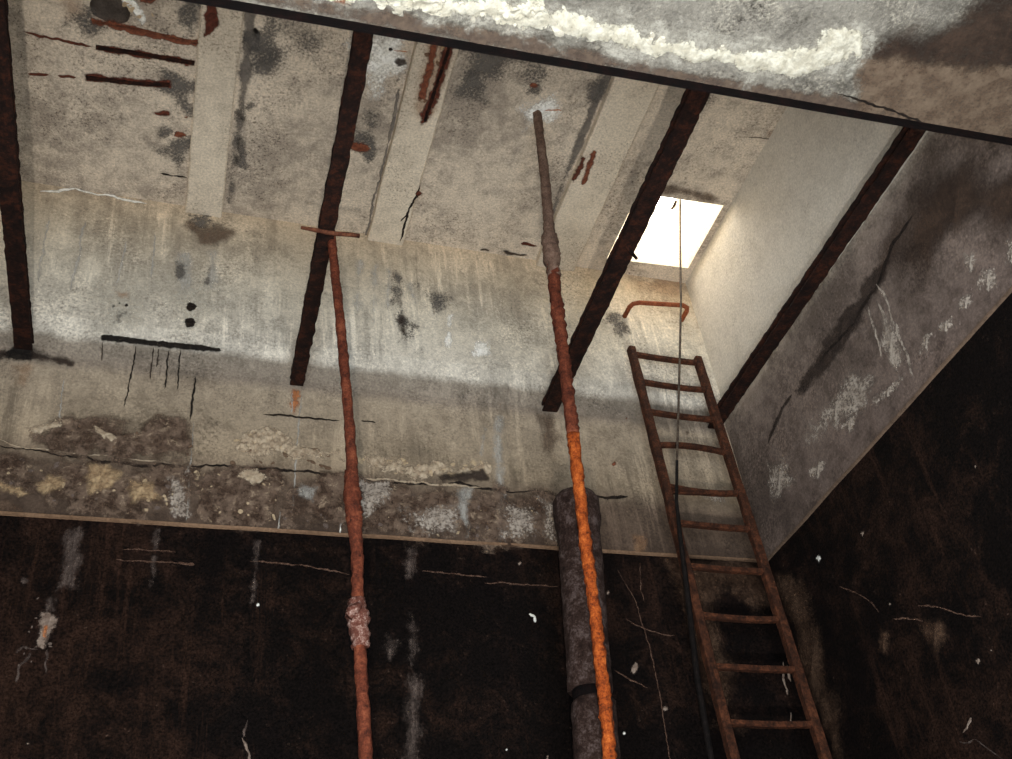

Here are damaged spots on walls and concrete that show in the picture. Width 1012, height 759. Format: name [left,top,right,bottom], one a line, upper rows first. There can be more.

spalling [24,0,198,66]
rust [203,6,219,37]
leakage [155,70,195,117]
leakage [231,0,1012,212]
rust [572,151,597,185]
leakage [882,147,1012,273]
crack [768,216,912,443]
leakage [868,284,913,375]
leakage [807,370,873,443]
peeling [0,414,348,531]
peeling [358,455,558,552]
peeling [16,604,57,681]